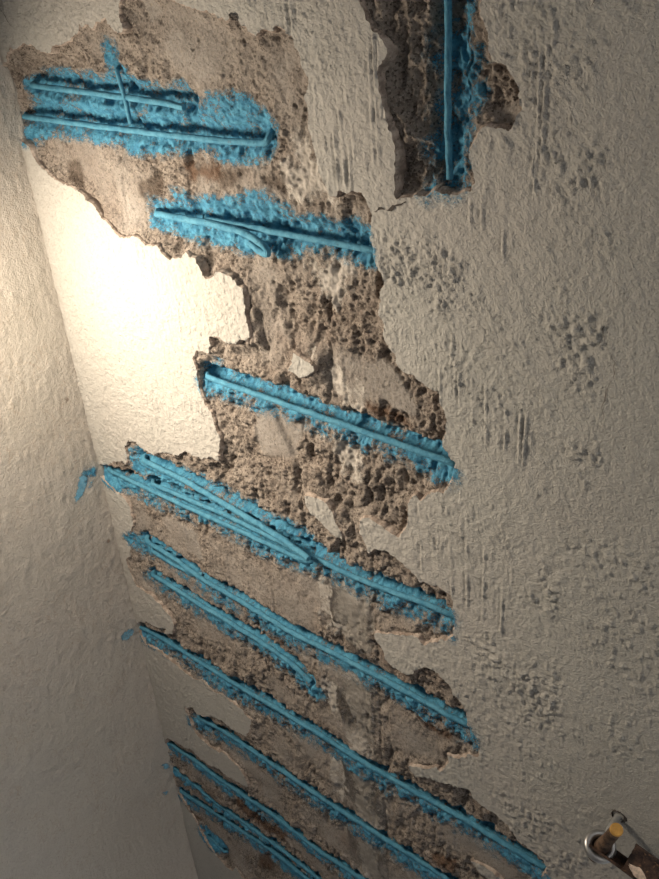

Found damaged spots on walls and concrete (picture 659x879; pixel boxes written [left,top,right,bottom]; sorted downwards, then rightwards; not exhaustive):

spalling [358,0,522,204]
crack [375,201,406,212]
spalling [138,630,550,879]